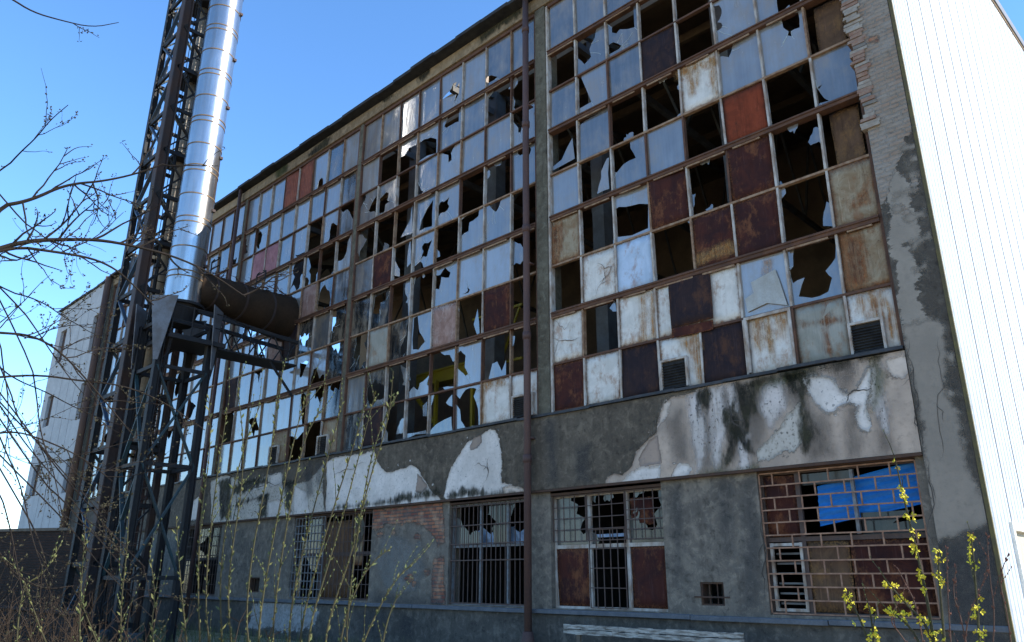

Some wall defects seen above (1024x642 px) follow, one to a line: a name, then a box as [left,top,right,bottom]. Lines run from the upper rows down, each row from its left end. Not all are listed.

flaking render [605,0,987,542]
rust [753,312,787,348]
rust [857,292,899,338]
leakage [689,353,889,472]
leakage [218,478,268,520]
leakage [285,481,294,512]
flaking render [180,428,524,605]